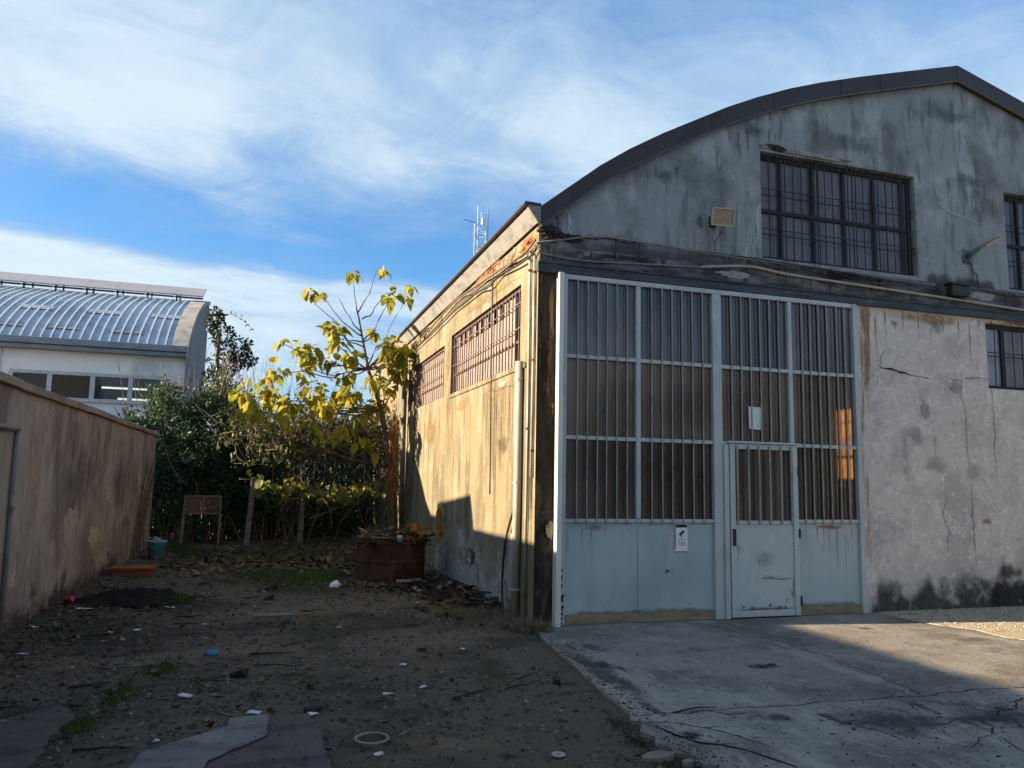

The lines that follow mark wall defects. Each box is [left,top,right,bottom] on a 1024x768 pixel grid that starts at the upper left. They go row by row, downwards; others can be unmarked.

water stain [573,243,746,265]
water stain [816,272,883,286]
crack [880,348,999,563]
water stain [872,566,1024,612]
crack [637,622,1023,767]